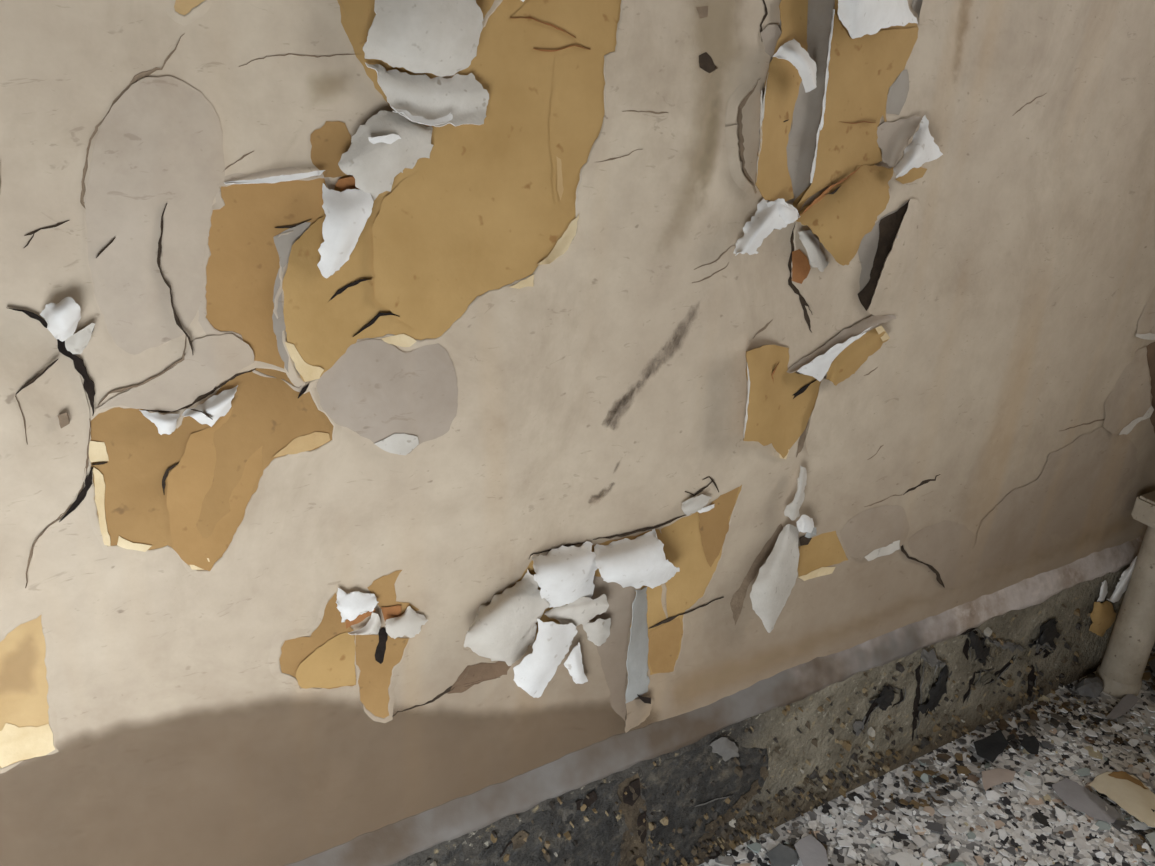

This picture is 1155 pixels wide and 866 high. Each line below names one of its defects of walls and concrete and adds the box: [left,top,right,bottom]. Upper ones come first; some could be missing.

crack [8,297,96,416]
peeling [82,0,634,579]
peeling [448,0,943,733]
crack [773,223,820,332]
peeling [1103,286,1155,435]
crack [59,467,93,522]
crack [901,536,945,588]
peeling [0,612,60,774]
peeling [268,570,428,723]